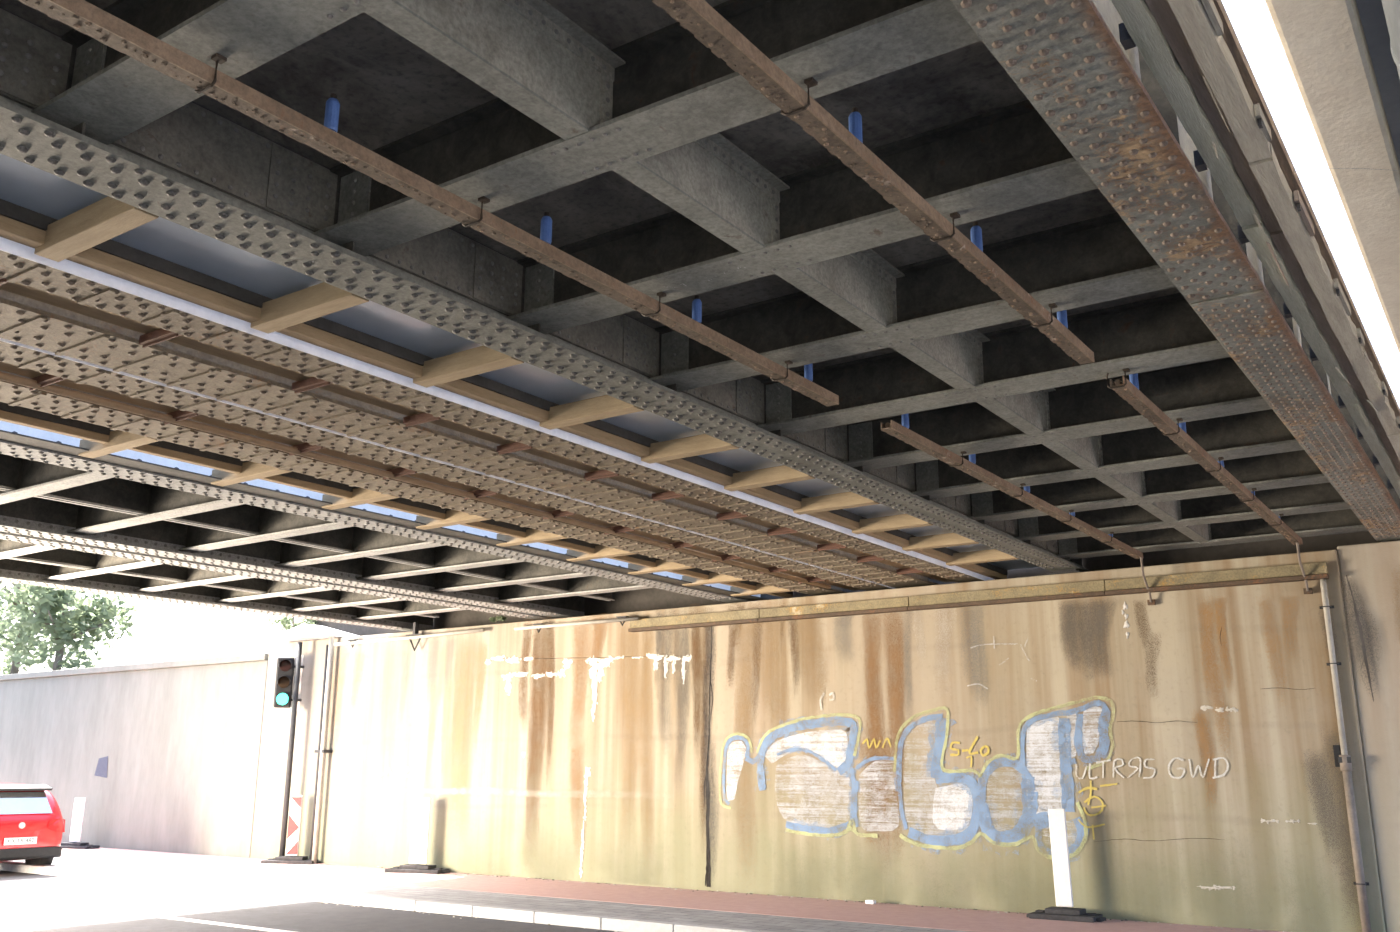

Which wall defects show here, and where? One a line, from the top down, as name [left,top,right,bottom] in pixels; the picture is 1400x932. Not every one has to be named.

rust [518,612,655,872]
rust [688,601,763,855]
rust [779,602,800,695]
water stain [1058,597,1162,698]
water stain [1300,609,1362,931]